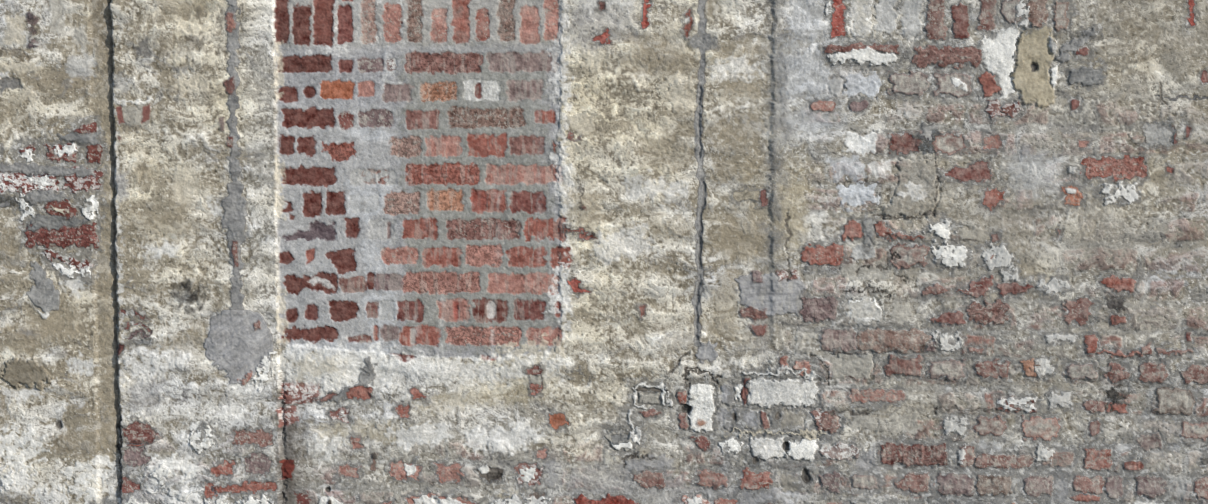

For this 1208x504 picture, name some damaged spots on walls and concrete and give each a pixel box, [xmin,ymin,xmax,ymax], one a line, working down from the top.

peeling [641,0,654,29]
peeling [680,4,695,39]
peeling [810,0,1109,214]
peeling [0,115,109,284]
peeling [563,224,599,244]
crack [668,0,722,388]
peeling [1057,119,1194,211]
peeling [566,276,593,298]
peeling [572,212,1208,504]
peeling [116,415,164,500]
peeling [186,422,283,504]
crack [622,452,655,468]